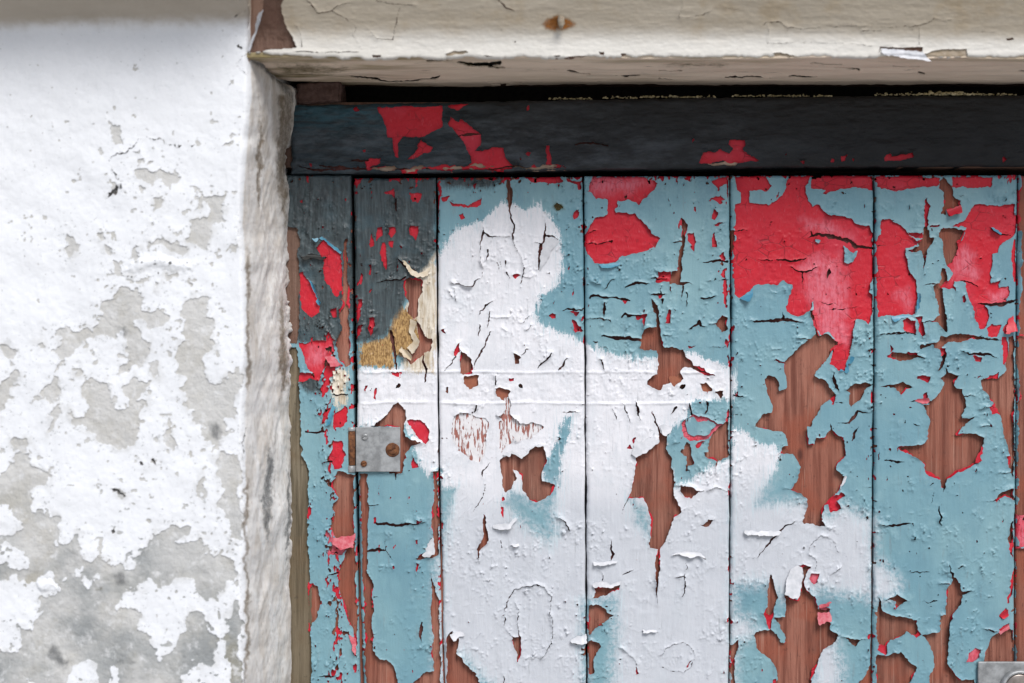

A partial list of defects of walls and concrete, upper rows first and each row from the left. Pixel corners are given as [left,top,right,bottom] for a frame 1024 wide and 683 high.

crack [297,1,409,79]
crack [459,59,502,67]
peeling [106,106,123,145]
crack [422,212,559,385]
crack [522,316,568,371]
crack [751,312,806,350]
crack [762,232,874,310]
peeling [0,128,245,683]
peeling [345,104,1024,683]
peeling [286,226,433,683]
peeling [754,564,974,683]